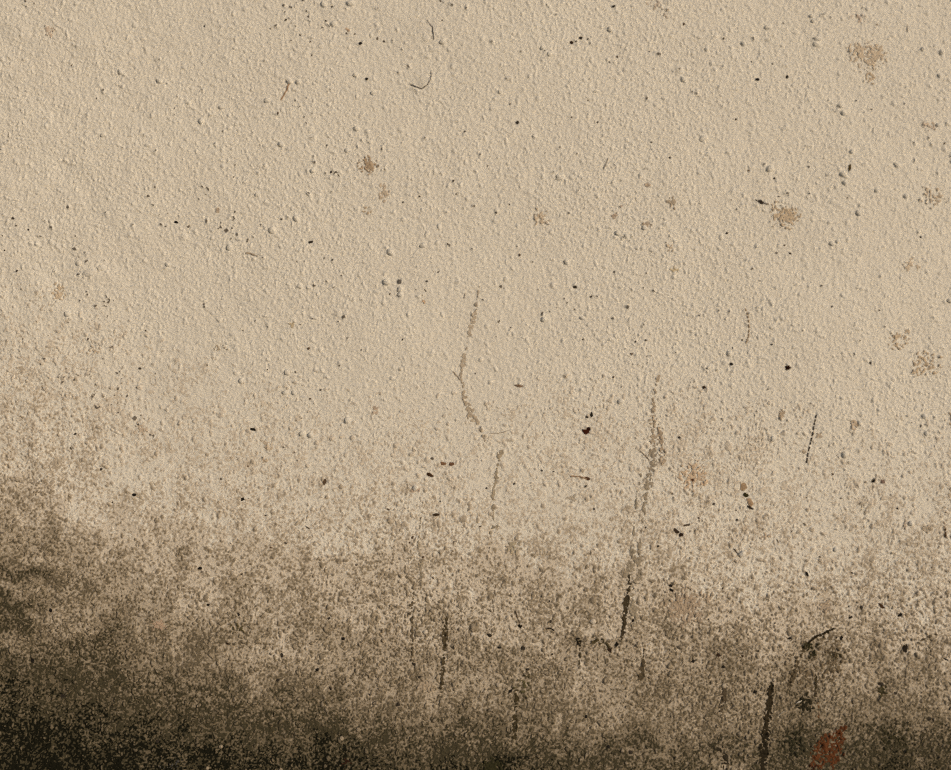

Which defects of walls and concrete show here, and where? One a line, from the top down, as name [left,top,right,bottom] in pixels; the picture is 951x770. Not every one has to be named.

rust [808,725,848,770]